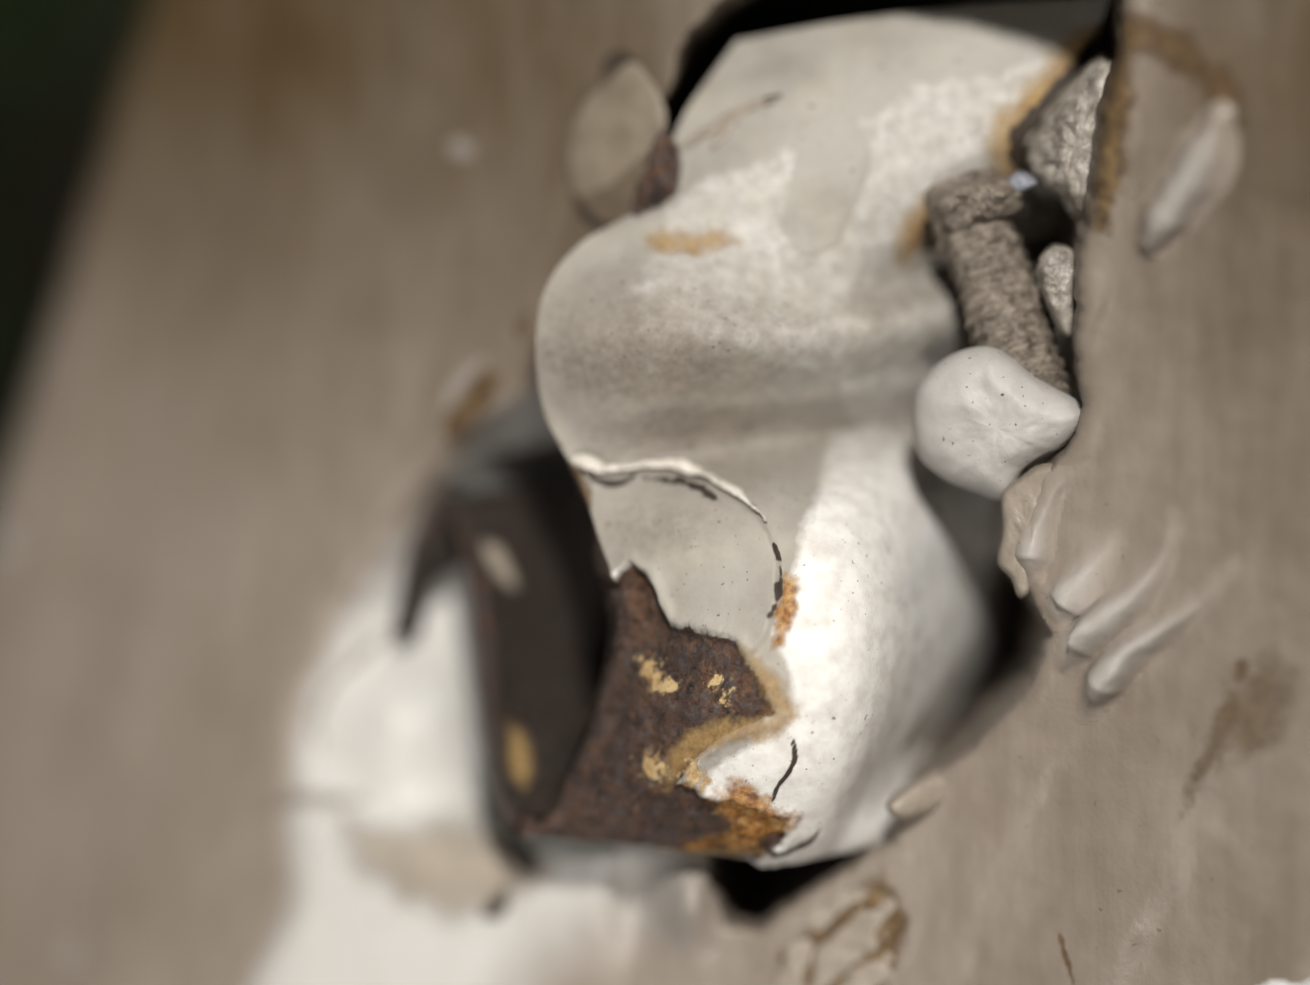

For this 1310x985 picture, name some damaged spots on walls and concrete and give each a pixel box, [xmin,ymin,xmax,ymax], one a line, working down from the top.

peeling [566,51,682,230]
peeling [569,453,767,522]
peeling [767,542,783,618]
corrosion [511,731,530,779]
corrosion [529,565,799,861]
peeling [774,875,909,985]